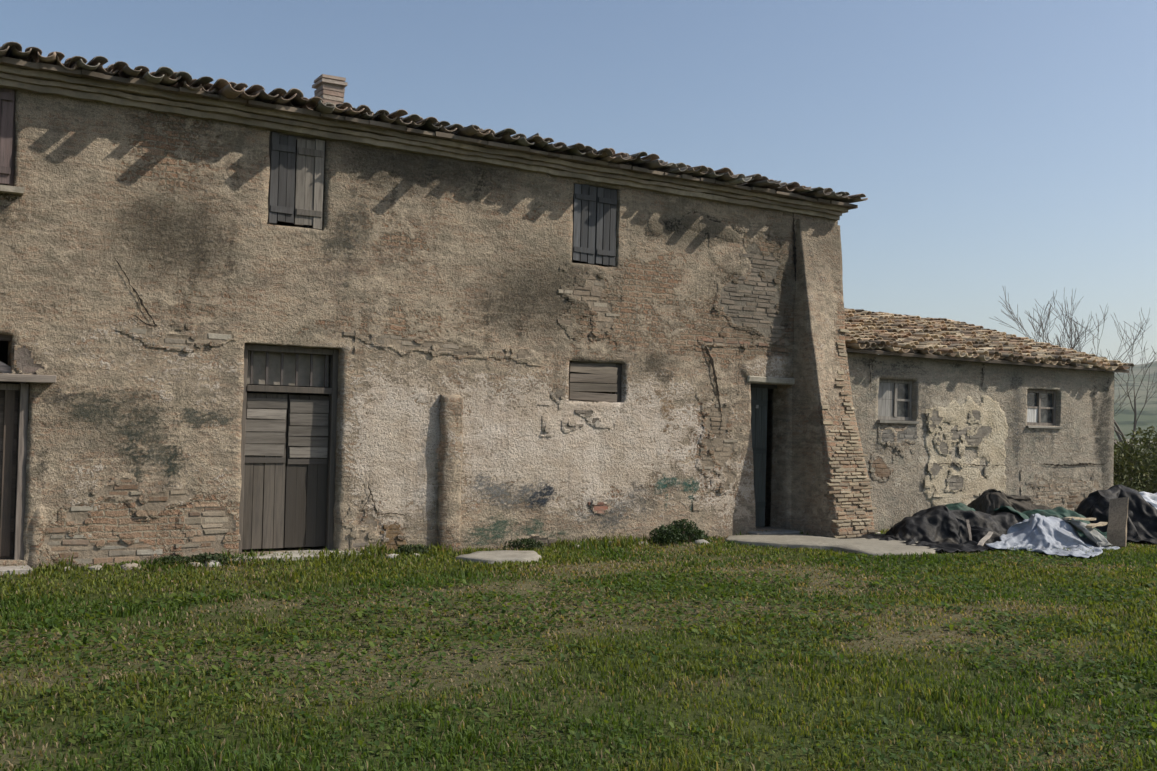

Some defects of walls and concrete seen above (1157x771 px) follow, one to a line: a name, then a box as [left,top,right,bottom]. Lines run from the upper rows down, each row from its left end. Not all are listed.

crack [115,259,157,327]
flaking render [698,220,793,352]
crack [791,214,799,281]
flaking render [43,473,241,568]
damp [180,407,233,428]
flaking render [342,499,407,554]
crack [364,473,405,524]
crack [683,346,740,436]
peeling [693,390,744,510]
peeling [822,371,1008,538]
crack [1040,463,1103,472]
damp [1091,379,1112,489]